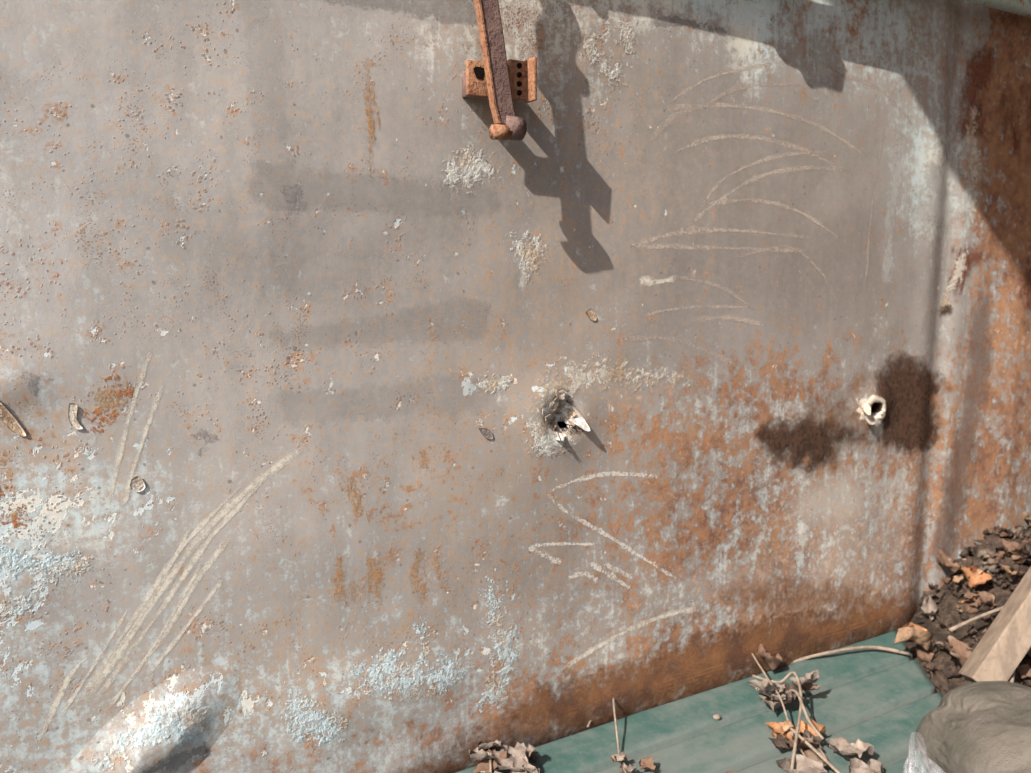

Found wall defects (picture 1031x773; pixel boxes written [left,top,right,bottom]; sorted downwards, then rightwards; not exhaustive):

rust [960,50,992,223]
rust [932,248,982,315]
rust [83,374,134,433]
damp [877,356,938,450]
damp [756,419,860,472]
rust [0,504,32,529]
rust [416,587,917,773]